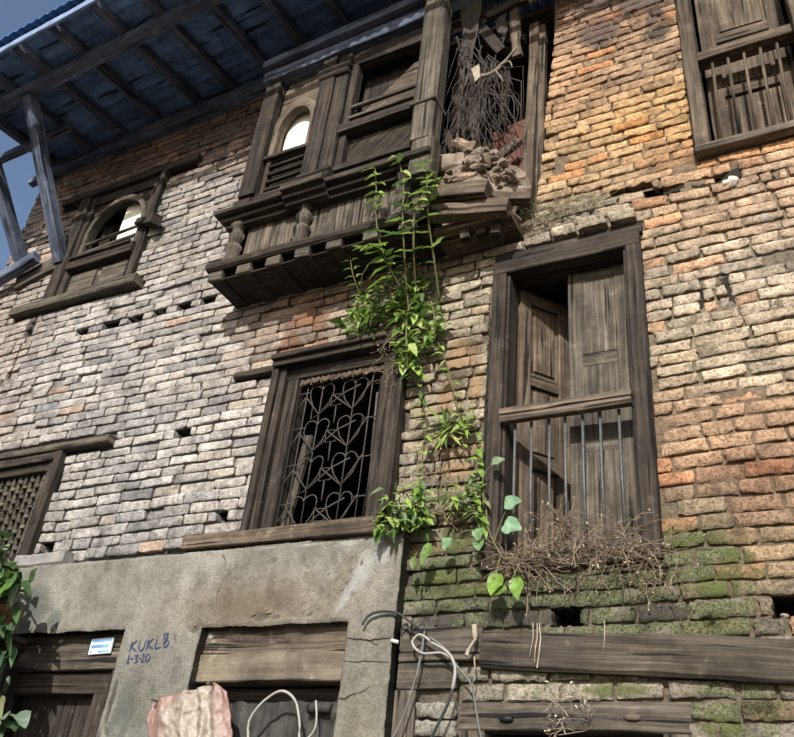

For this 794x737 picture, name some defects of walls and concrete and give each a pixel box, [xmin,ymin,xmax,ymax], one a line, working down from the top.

leakage [422,609,453,627]
leakage [633,604,683,622]
crack [343,637,389,662]